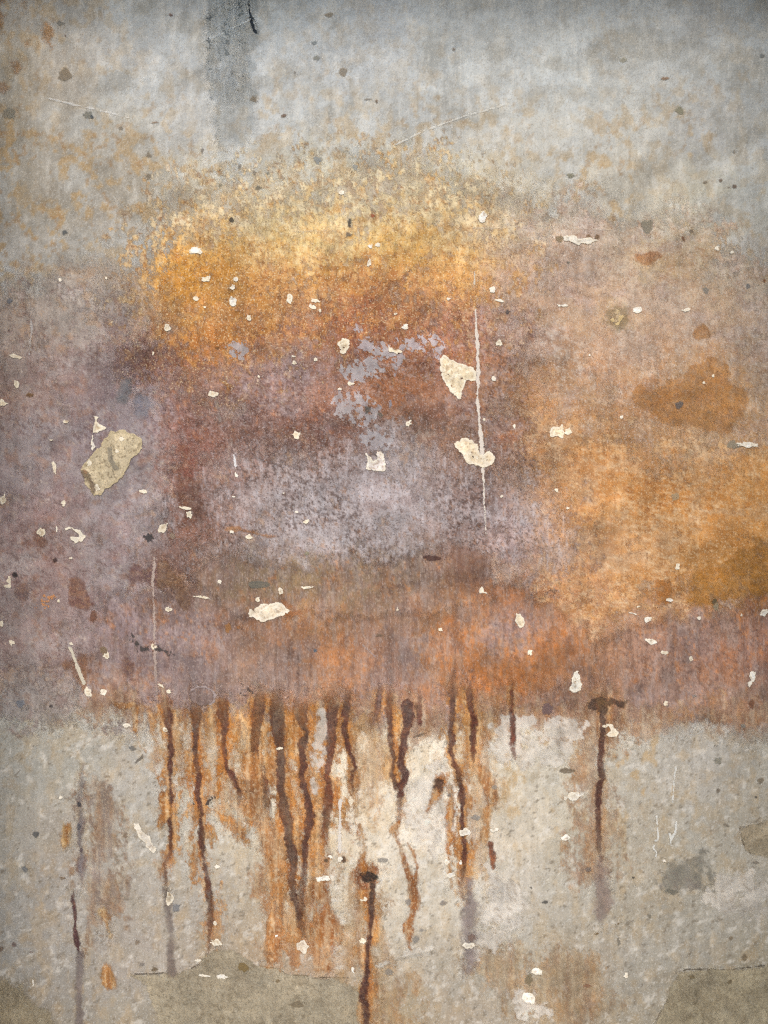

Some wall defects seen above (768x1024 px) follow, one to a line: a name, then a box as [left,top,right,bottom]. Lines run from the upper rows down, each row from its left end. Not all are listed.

spalling [337,338,350,354]
spalling [440,355,476,400]
crack [473,271,487,530]
spalling [81,416,142,496]
spalling [365,452,386,472]
spalling [454,438,495,468]
corrosion [0,132,768,951]
spalling [248,587,297,622]
corrosion [70,893,84,1024]
corrosion [165,891,176,976]
corrosion [308,880,342,973]
corrosion [351,824,381,1024]